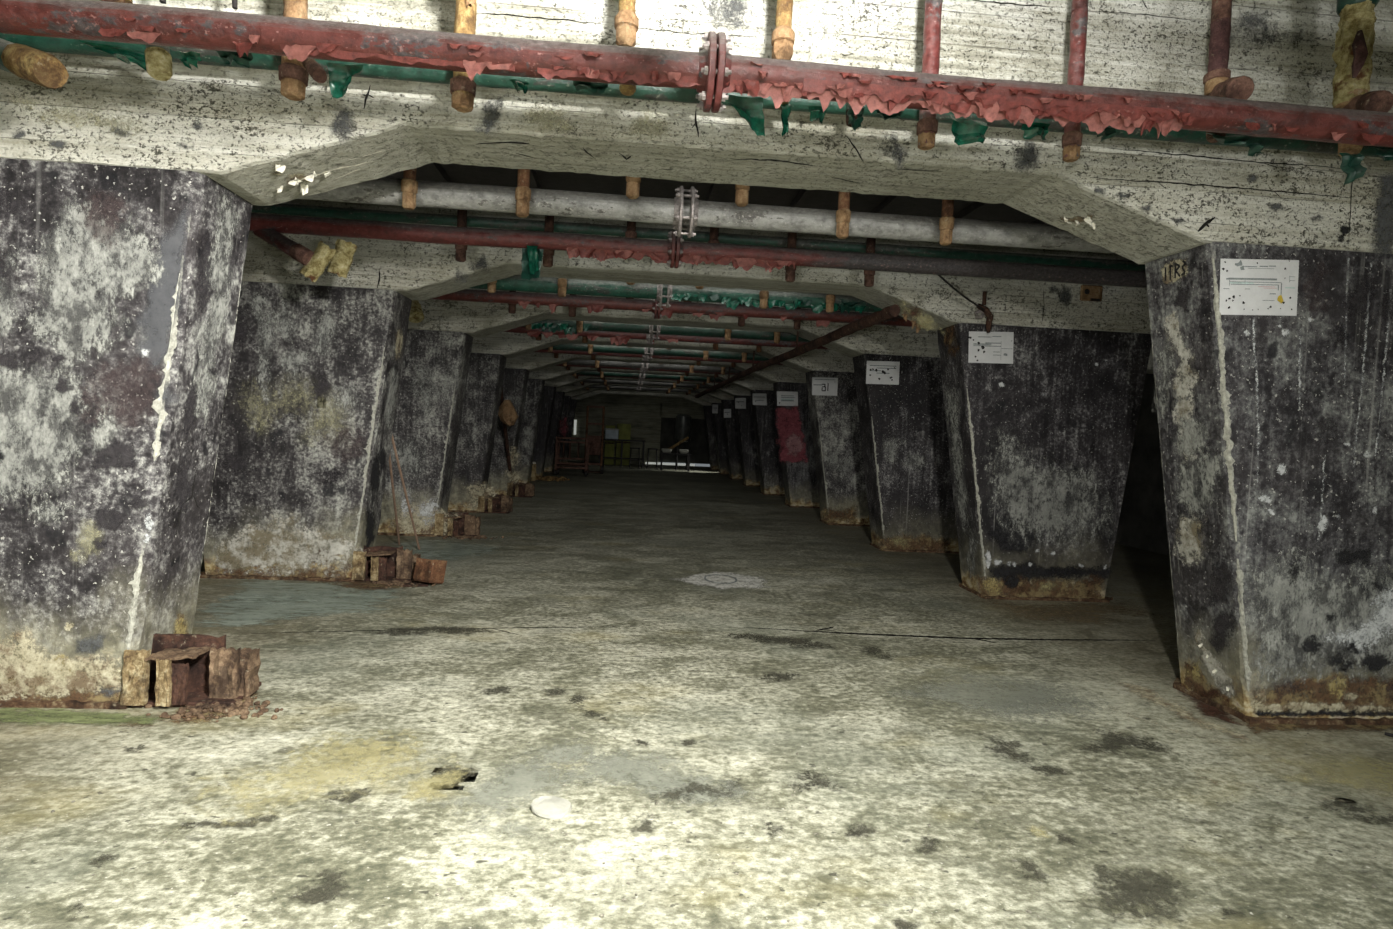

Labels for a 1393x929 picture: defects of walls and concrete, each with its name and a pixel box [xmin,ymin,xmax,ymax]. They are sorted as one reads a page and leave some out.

peeling [448,43,512,81]
peeling [558,52,604,79]
peeling [725,61,811,102]
peeling [564,247,681,262]
damp [1330,264,1393,463]
damp [144,513,154,543]
damp [215,511,361,578]
rust [978,575,1103,599]
rust [1178,662,1393,734]